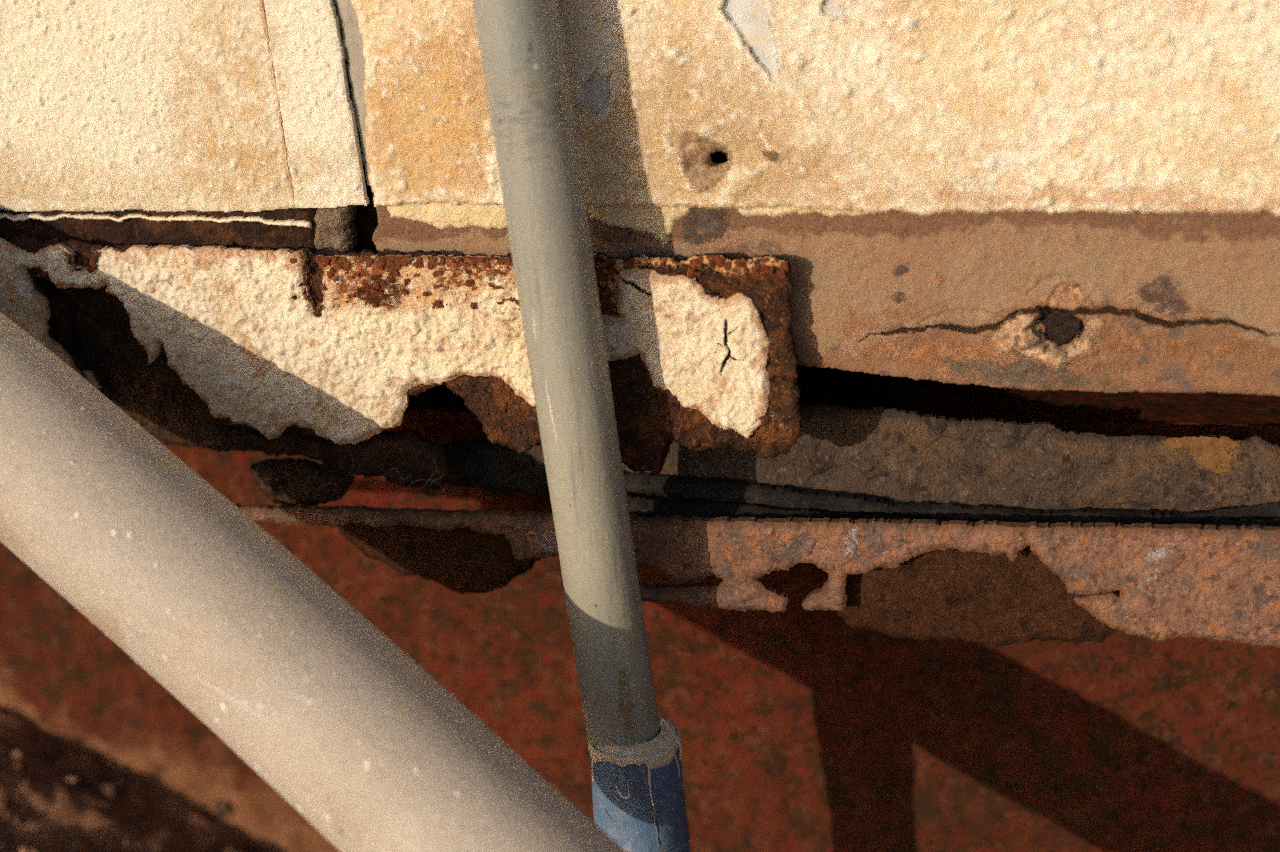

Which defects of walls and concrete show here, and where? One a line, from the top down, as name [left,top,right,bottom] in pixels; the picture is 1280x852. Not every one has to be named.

peeling [715,0,782,83]
peeling [580,69,611,117]
rust [186,248,520,340]
rust [593,255,789,315]
crack [860,281,1276,341]
spalling [35,277,282,457]
rust [527,444,546,469]
rust [622,402,1280,527]